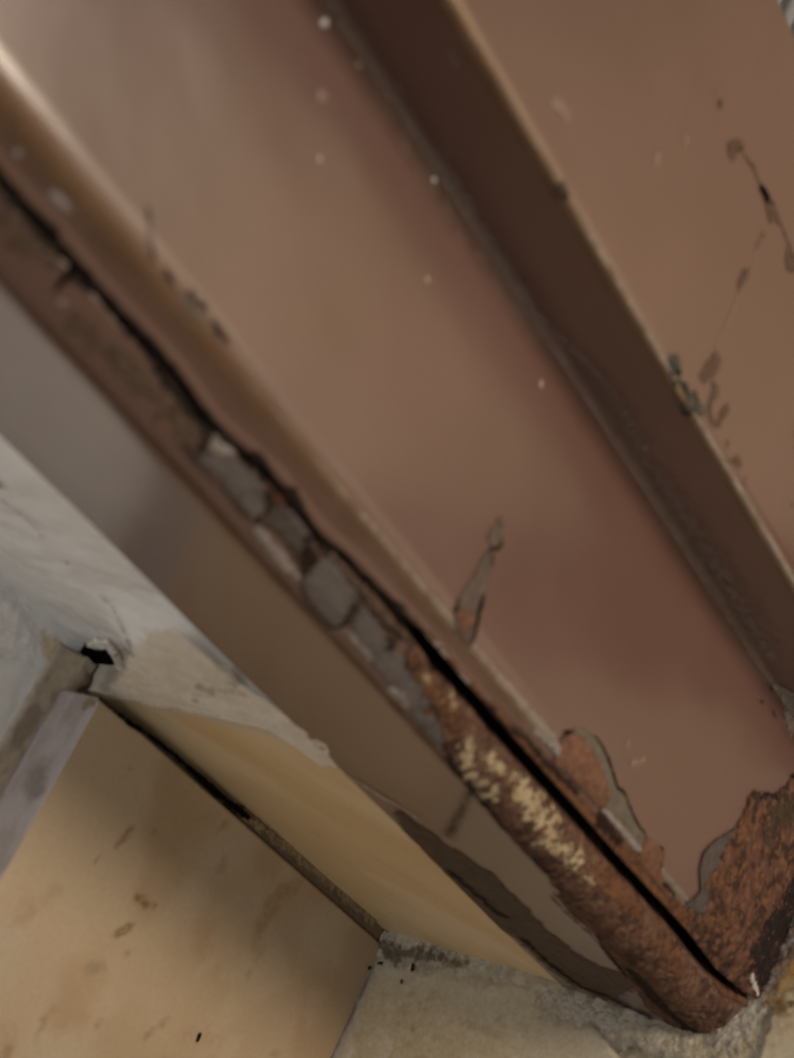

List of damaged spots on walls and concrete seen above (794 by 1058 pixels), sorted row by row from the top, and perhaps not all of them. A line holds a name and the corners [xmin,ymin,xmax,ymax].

crack [0,169,380,589]
peeling [0,282,453,772]
corrosion [299,531,794,1034]
peeling [406,517,691,903]
crack [405,616,739,989]
peeling [588,233,794,583]
peeling [761,185,779,224]